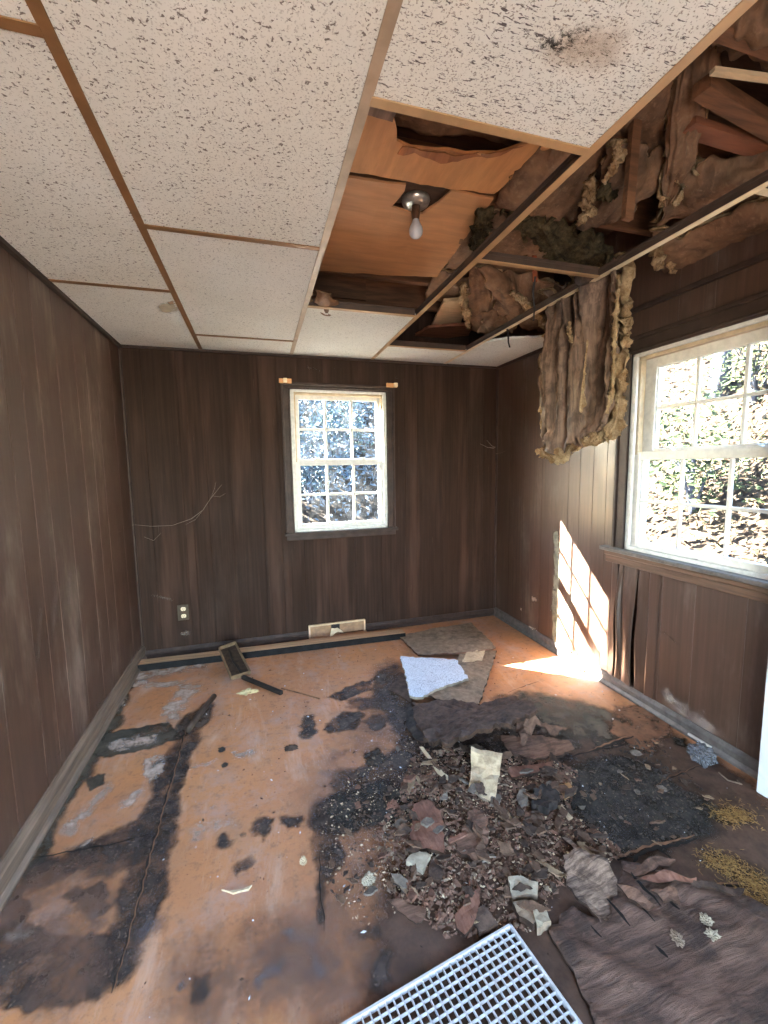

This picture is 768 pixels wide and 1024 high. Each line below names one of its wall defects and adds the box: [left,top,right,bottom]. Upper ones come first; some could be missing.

leakage [541,30,588,50]
peeling [368,107,396,122]
peeling [314,290,339,316]
leakage [0,664,214,1014]
leakage [216,665,768,1024]
leakage [178,969,234,1002]